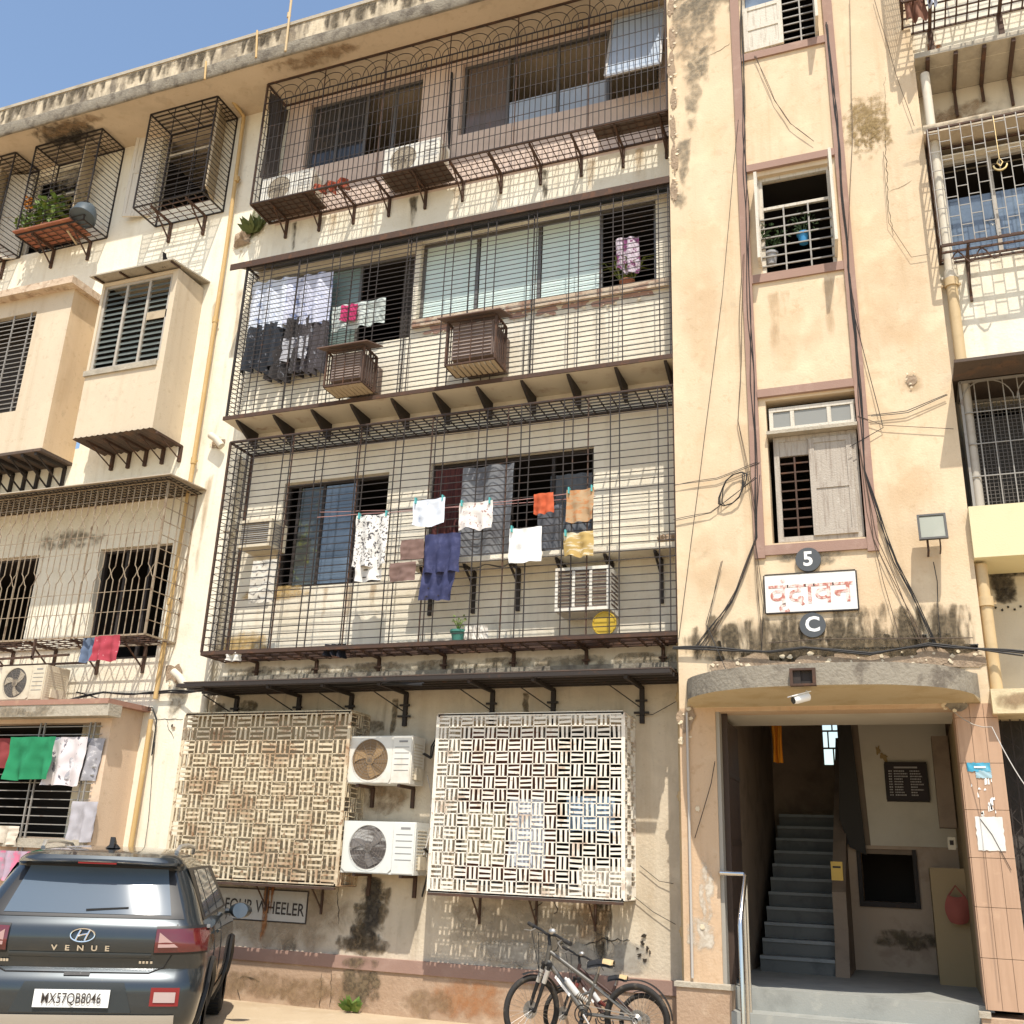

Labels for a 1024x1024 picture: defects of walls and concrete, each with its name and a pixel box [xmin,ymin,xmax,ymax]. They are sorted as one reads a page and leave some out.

damp [127,49,215,82]
damp [242,29,281,52]
damp [287,45,354,69]
damp [673,0,728,126]
damp [1,81,106,123]
damp [37,116,98,146]
damp [846,97,892,153]
damp [677,140,690,179]
damp [692,605,960,661]
corrosion [260,886,274,938]
damp [225,877,391,1003]
damp [453,900,612,959]